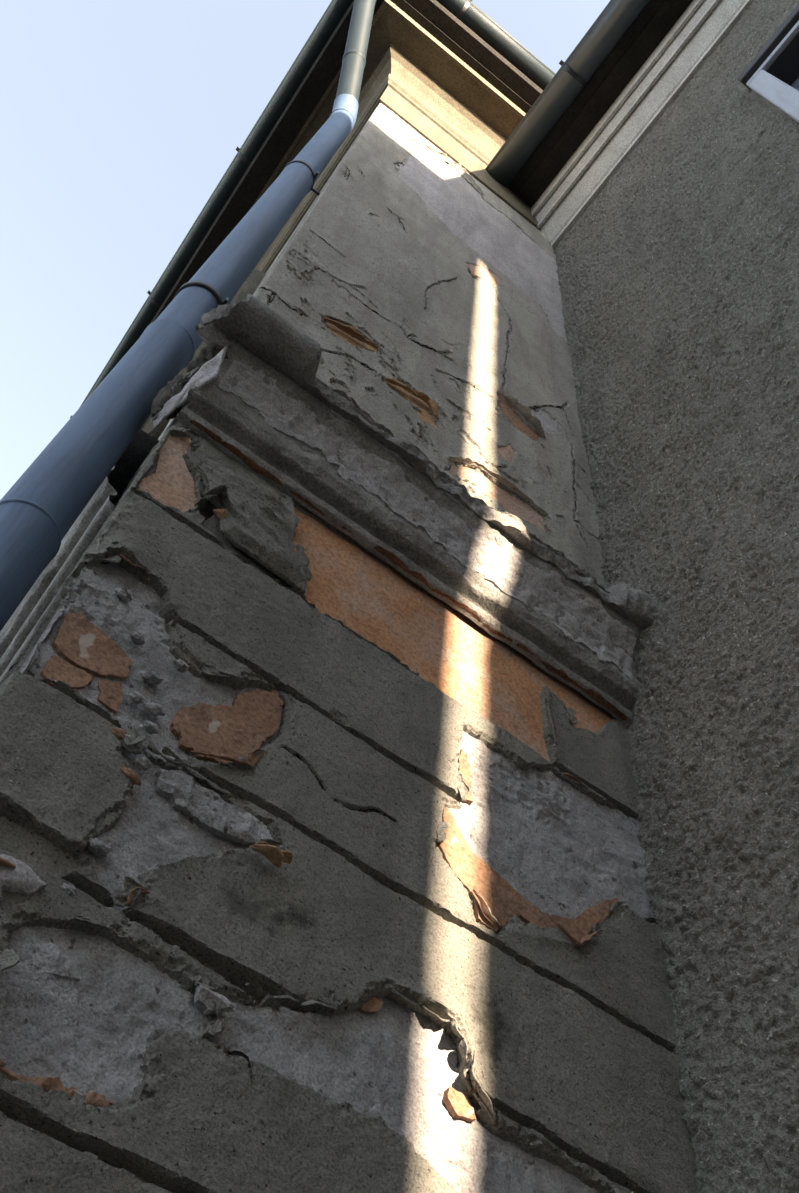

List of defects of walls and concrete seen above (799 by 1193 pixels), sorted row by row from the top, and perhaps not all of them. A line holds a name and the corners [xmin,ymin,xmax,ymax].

crack [261,287,305,316]
flaking render [322,315,378,352]
crack [308,236,512,391]
peeling [139,343,637,680]
crack [533,404,588,549]
flaking render [19,553,293,912]
flaking render [293,507,653,947]
flaking render [0,854,47,903]
flaking render [0,913,621,1193]